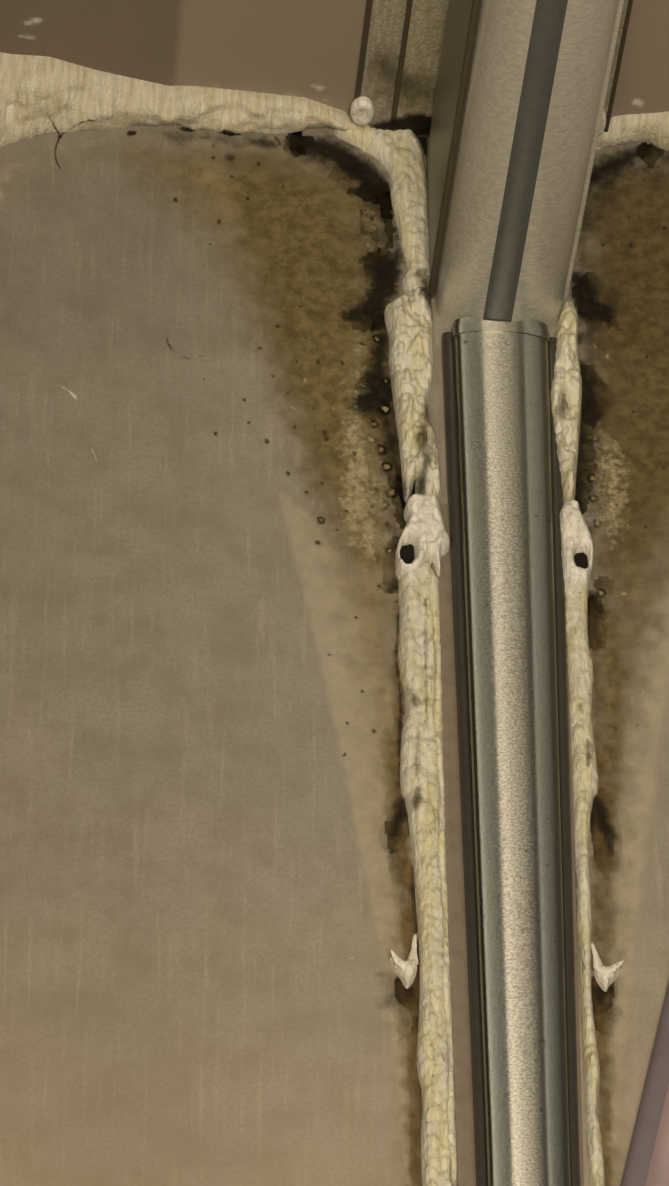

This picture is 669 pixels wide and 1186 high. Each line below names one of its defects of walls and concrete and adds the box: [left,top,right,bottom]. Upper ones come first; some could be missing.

water stain [167,136,401,629]
water stain [572,148,669,866]
water stain [383,668,403,726]
water stain [388,740,421,888]
water stain [406,903,418,1013]
water stain [595,986,607,1070]